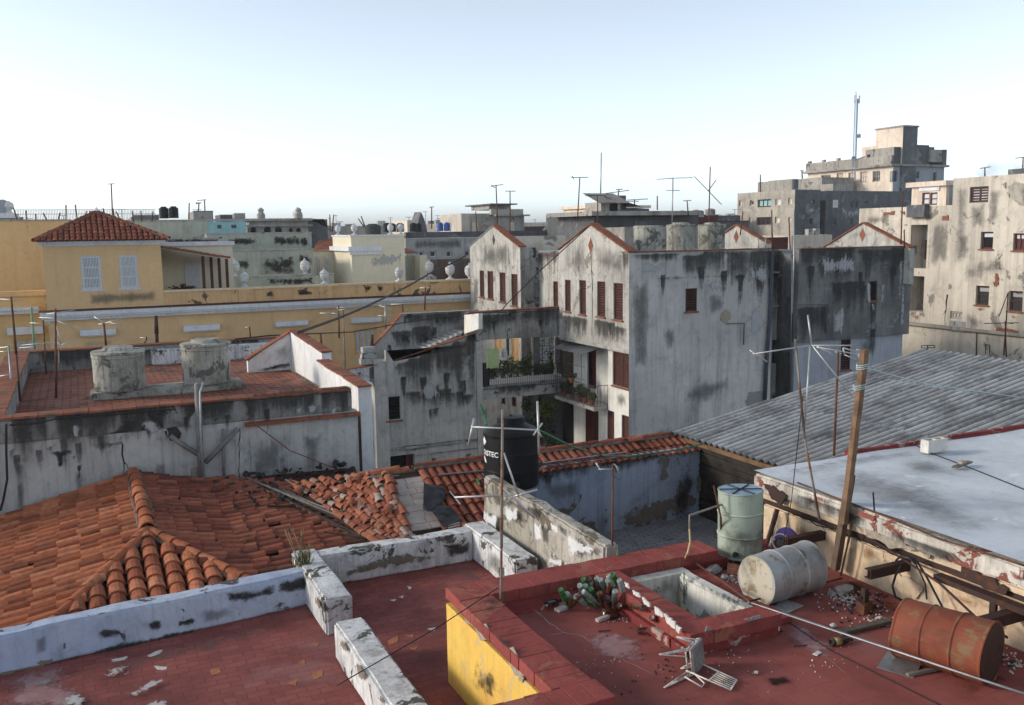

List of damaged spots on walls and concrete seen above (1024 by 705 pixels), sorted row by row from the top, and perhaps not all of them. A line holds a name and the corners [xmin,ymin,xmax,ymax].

water stain [934,228,946,259]
water stain [604,250,782,300]
peeling [822,253,854,276]
water stain [183,401,233,430]
water stain [10,406,170,478]
spalling [764,484,787,506]
peeling [483,506,517,529]
peeling [621,498,688,526]
peeling [534,523,593,566]
spalling [855,511,932,559]
spalling [961,566,1020,595]